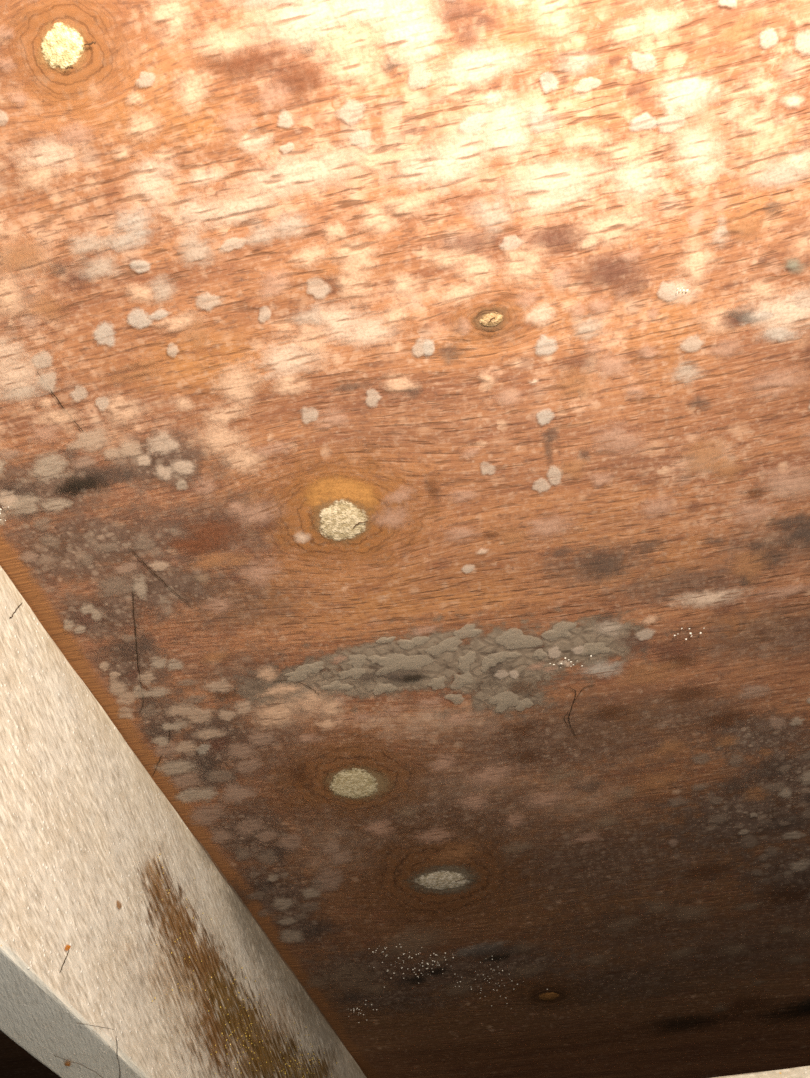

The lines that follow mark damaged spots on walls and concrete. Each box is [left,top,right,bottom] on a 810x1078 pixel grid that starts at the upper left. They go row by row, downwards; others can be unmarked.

damp [249,0,432,106]
damp [403,94,544,181]
damp [632,78,717,132]
damp [0,341,71,438]
damp [128,282,201,338]
damp [180,143,345,260]
damp [268,308,406,394]
damp [308,224,374,298]
damp [581,211,646,248]
damp [658,249,711,301]
damp [707,283,810,340]
damp [0,366,656,943]